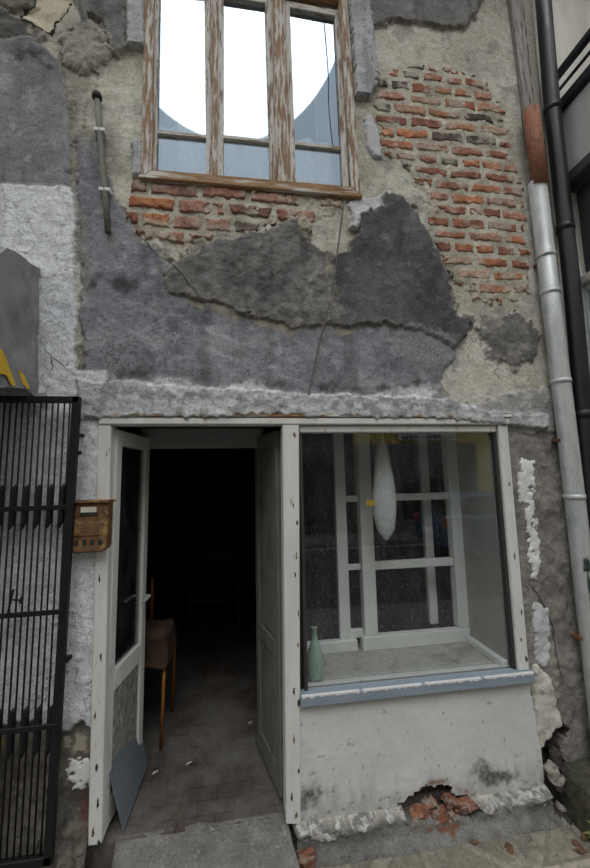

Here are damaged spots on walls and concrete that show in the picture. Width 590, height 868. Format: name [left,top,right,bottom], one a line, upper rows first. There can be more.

flaking render [123,179,388,247]
flaking render [363,65,531,306]
crack [531,585,563,684]
peeling [63,730,98,791]
damp [476,760,512,786]